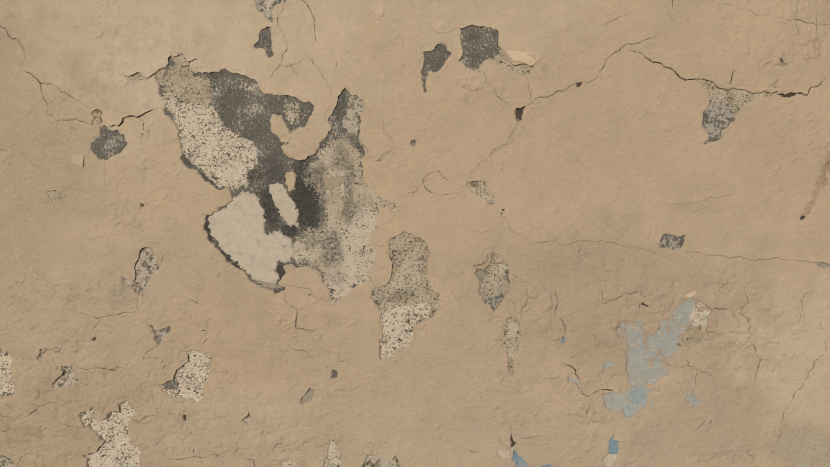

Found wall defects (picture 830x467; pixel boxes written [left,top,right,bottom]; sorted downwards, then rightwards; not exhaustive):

crack [0,23,89,124]
peeling [252,0,286,57]
peeling [421,21,539,92]
crack [726,2,830,47]
crack [406,33,826,198]
spalling [696,76,798,144]
peeling [71,53,397,302]
spalling [371,228,441,359]
spalling [463,248,512,311]
spalling [158,350,212,401]
peeling [561,291,711,417]
spalling [79,401,143,467]